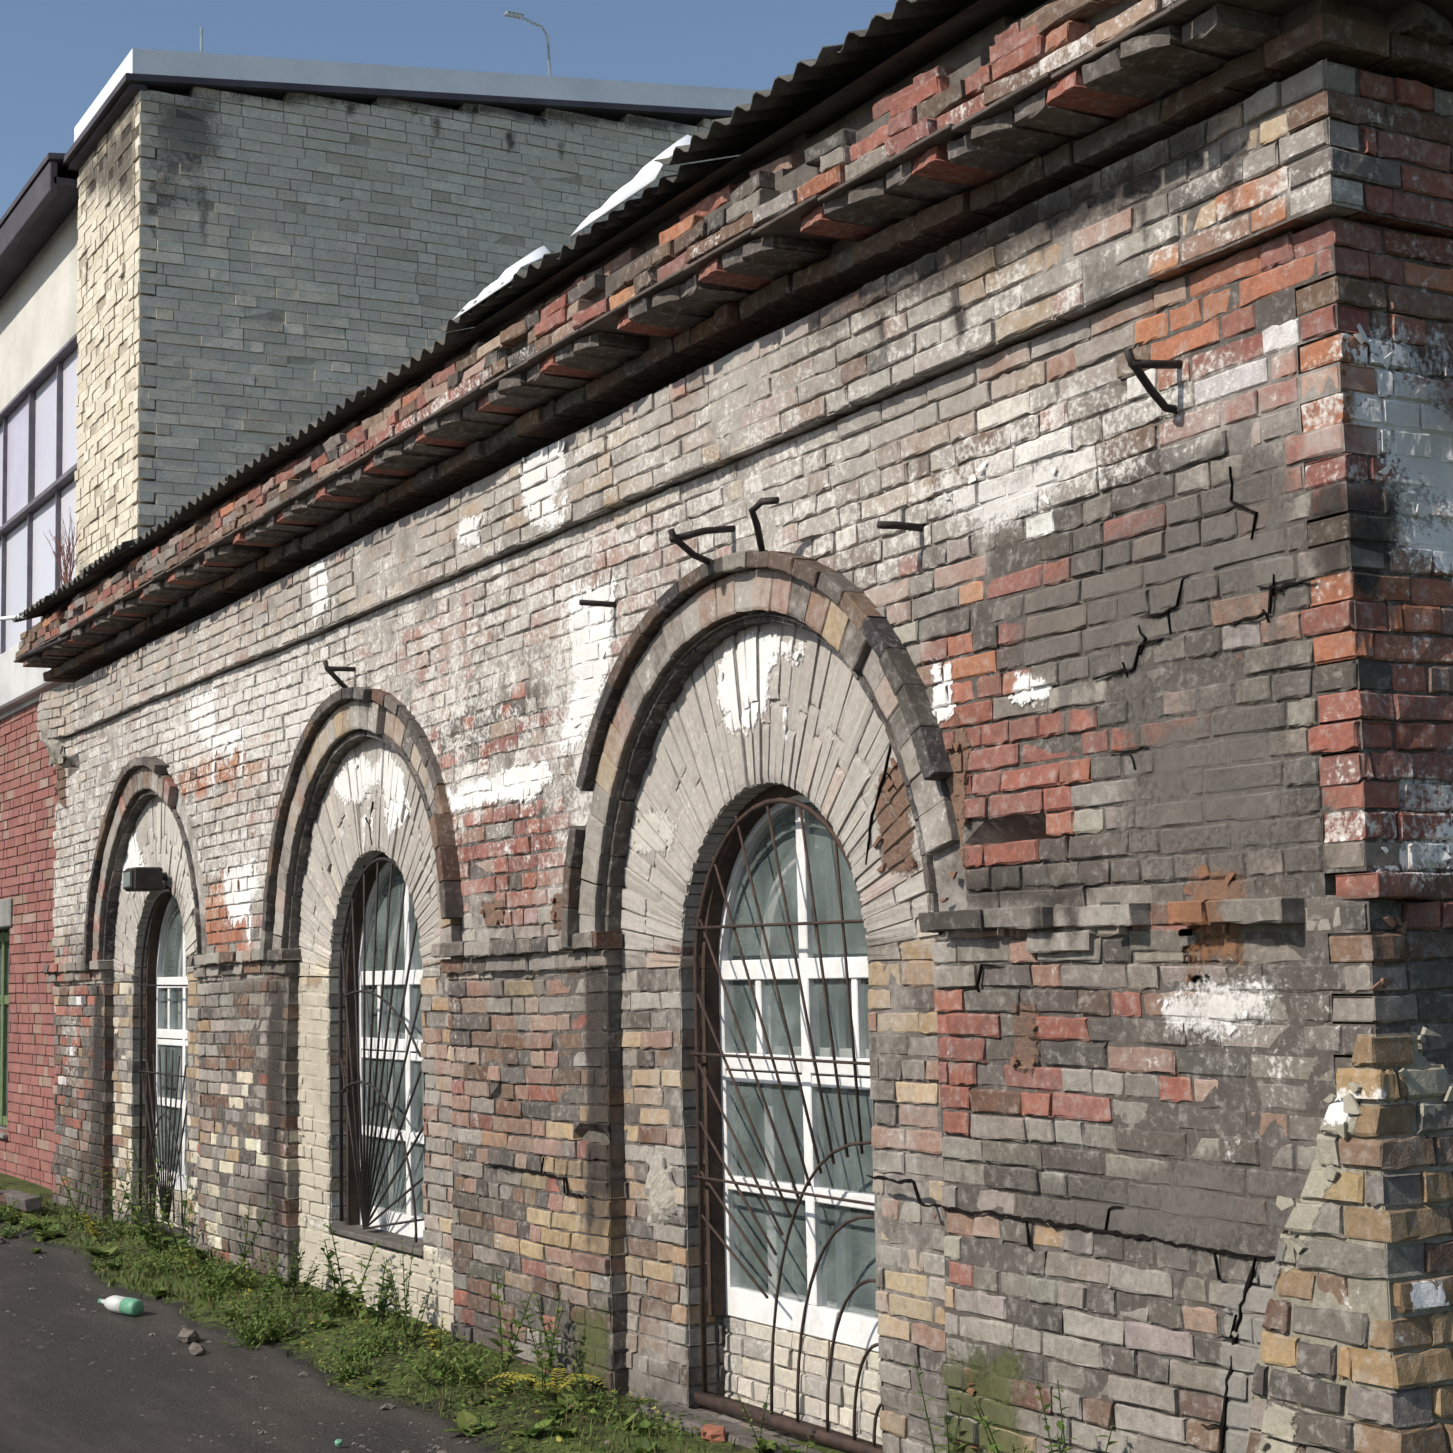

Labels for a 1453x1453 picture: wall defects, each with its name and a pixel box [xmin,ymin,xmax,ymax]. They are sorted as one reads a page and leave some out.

leakage [81,94,219,235]
peeling [457,515,482,548]
peeling [518,438,572,530]
crack [1221,466,1258,540]
peeling [1340,323,1453,582]
peeling [308,559,330,629]
crack [1092,576,1190,680]
crack [1230,574,1315,625]
peeling [447,576,617,814]
spalling [873,758,920,876]
peeling [1323,1082,1362,1140]
crack [866,1175,1276,1453]